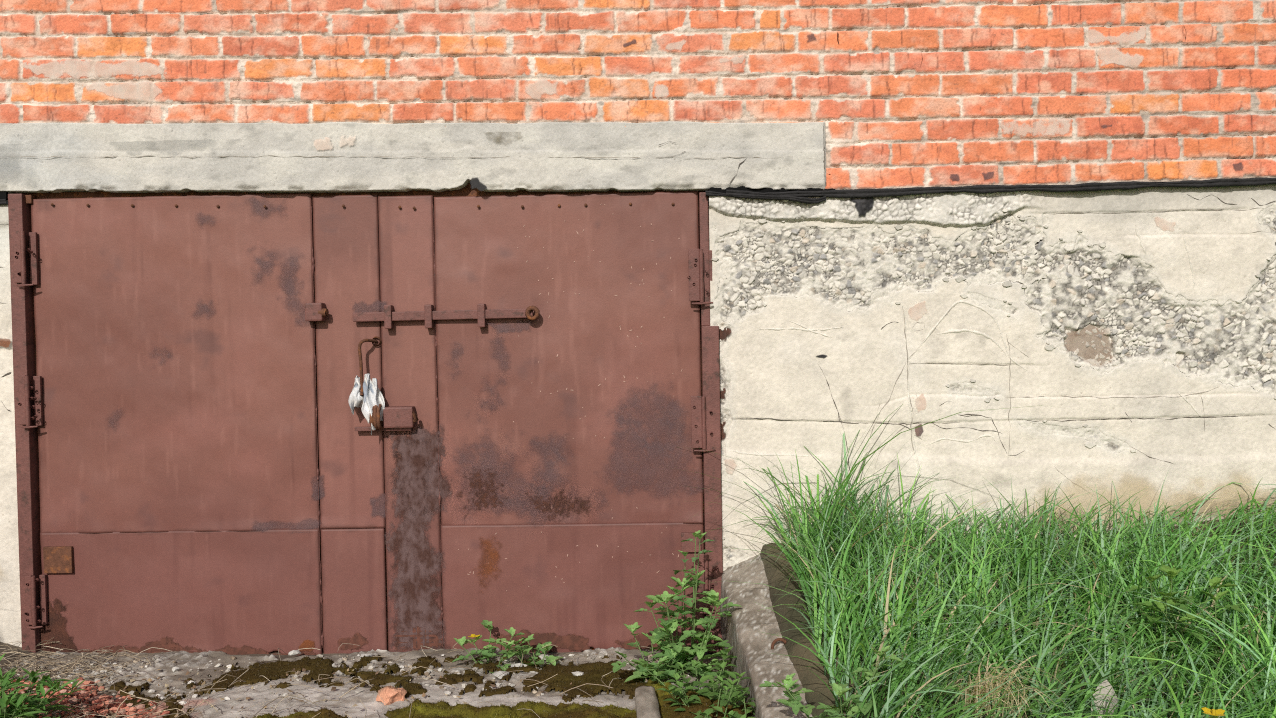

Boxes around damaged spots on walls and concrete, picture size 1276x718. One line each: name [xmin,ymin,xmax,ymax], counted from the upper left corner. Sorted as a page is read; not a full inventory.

corrosion [386,426,503,651]
corrosion [534,491,589,517]
spalling [710,202,1276,571]
crack [738,306,1274,503]